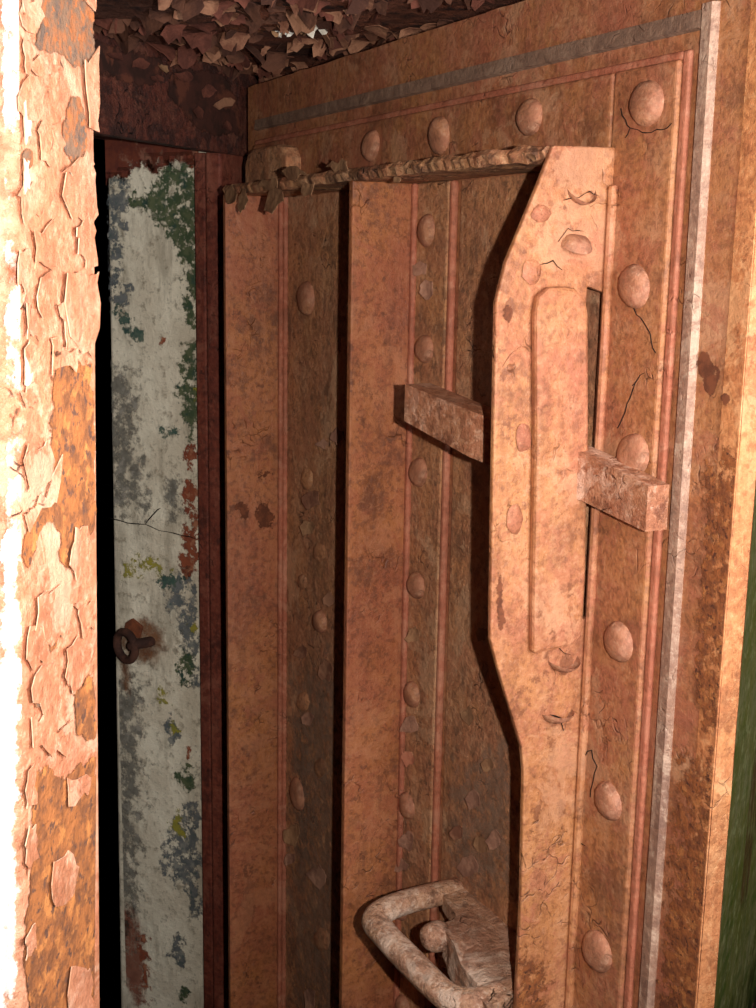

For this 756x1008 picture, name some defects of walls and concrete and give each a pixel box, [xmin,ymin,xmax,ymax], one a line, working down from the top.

peeling [464,0,495,11]
peeling [93,0,458,137]
peeling [1,0,101,389]
corrosion [503,305,513,323]
corrosion [696,351,730,406]
corrosion [235,501,275,529]
corrosion [496,573,506,630]
corrosion [693,447,737,733]
corrosion [122,619,161,690]
peeling [0,476,97,1008]
corrosion [655,746,714,1008]
corrosion [516,943,554,1008]